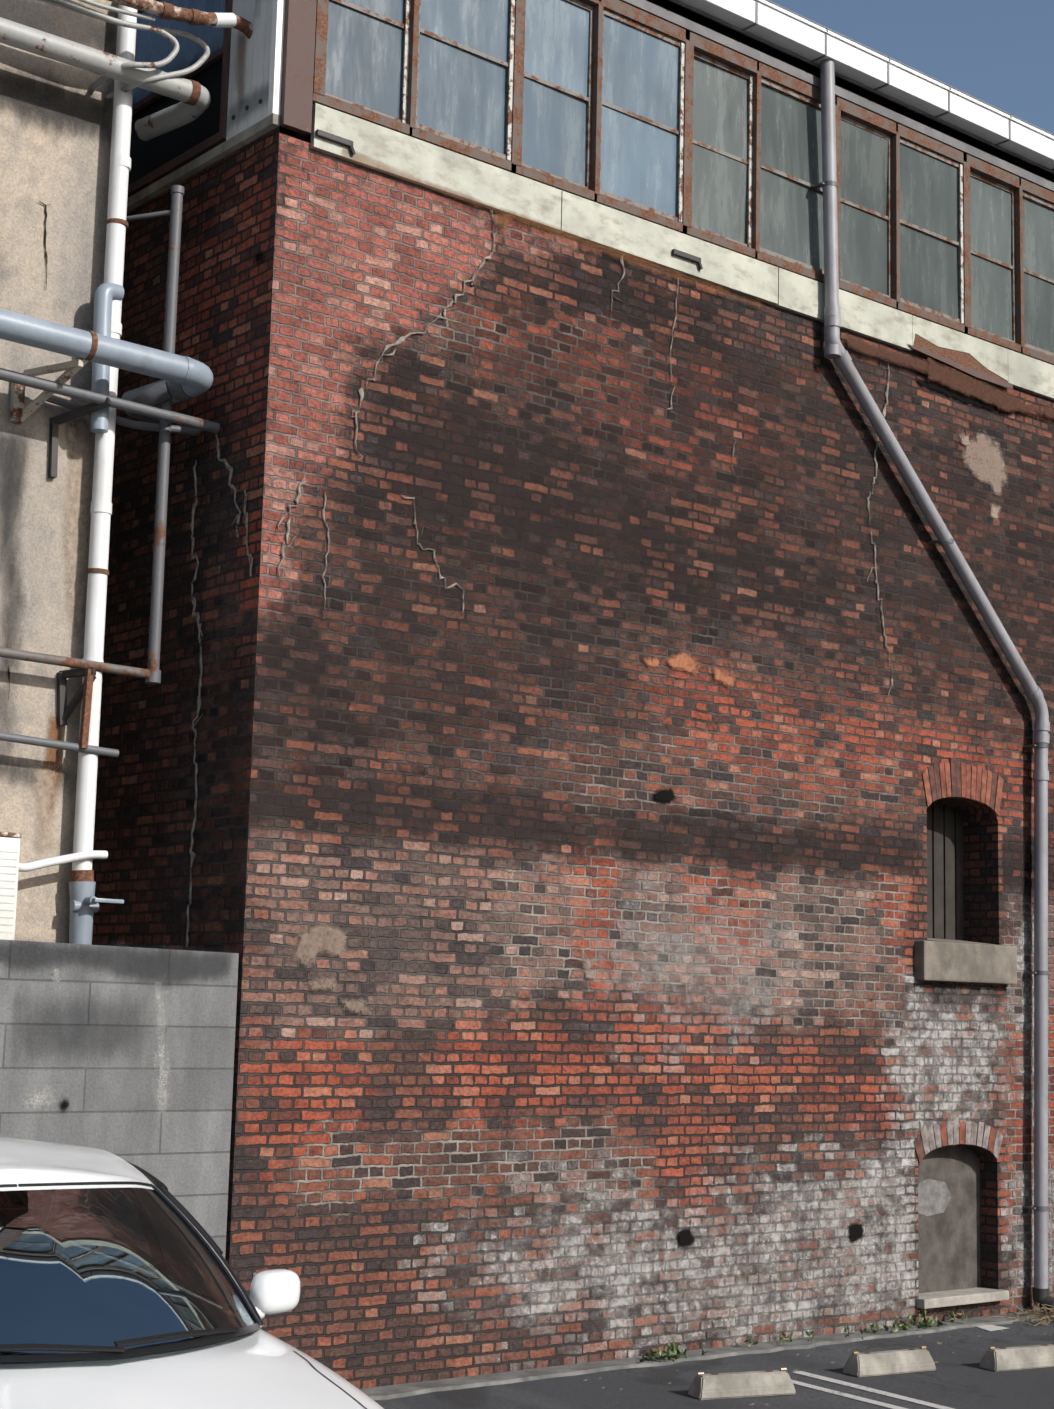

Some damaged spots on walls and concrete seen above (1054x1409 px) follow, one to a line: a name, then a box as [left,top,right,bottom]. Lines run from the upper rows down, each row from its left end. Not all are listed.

crack [352,209,496,460]
crack [665,278,679,418]
crack [401,495,464,612]
crack [866,361,893,696]
spalling [961,433,1006,520]
crack [186,434,329,949]
damp [84,951,225,983]
damp [467,910,1034,1358]
damp [1001,1171,1054,1285]